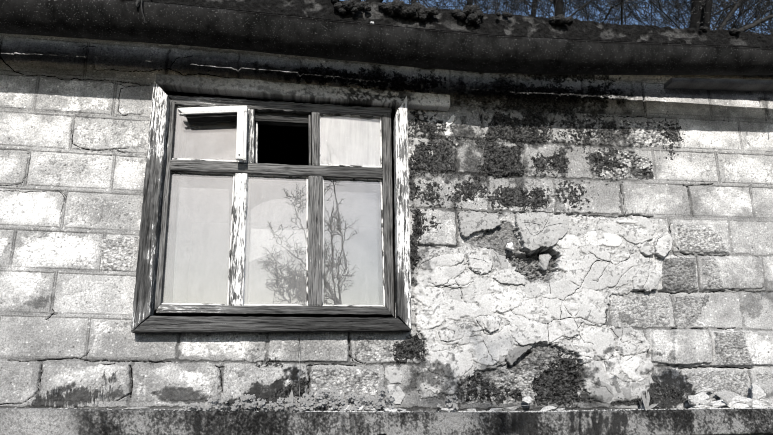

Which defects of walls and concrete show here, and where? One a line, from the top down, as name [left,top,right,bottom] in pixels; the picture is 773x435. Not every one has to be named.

crack [0,39,229,116]
crack [462,186,650,236]
crack [656,223,725,258]
peeling [411,211,773,405]
crack [434,252,755,394]
crack [0,353,173,405]
damp [491,412,541,435]